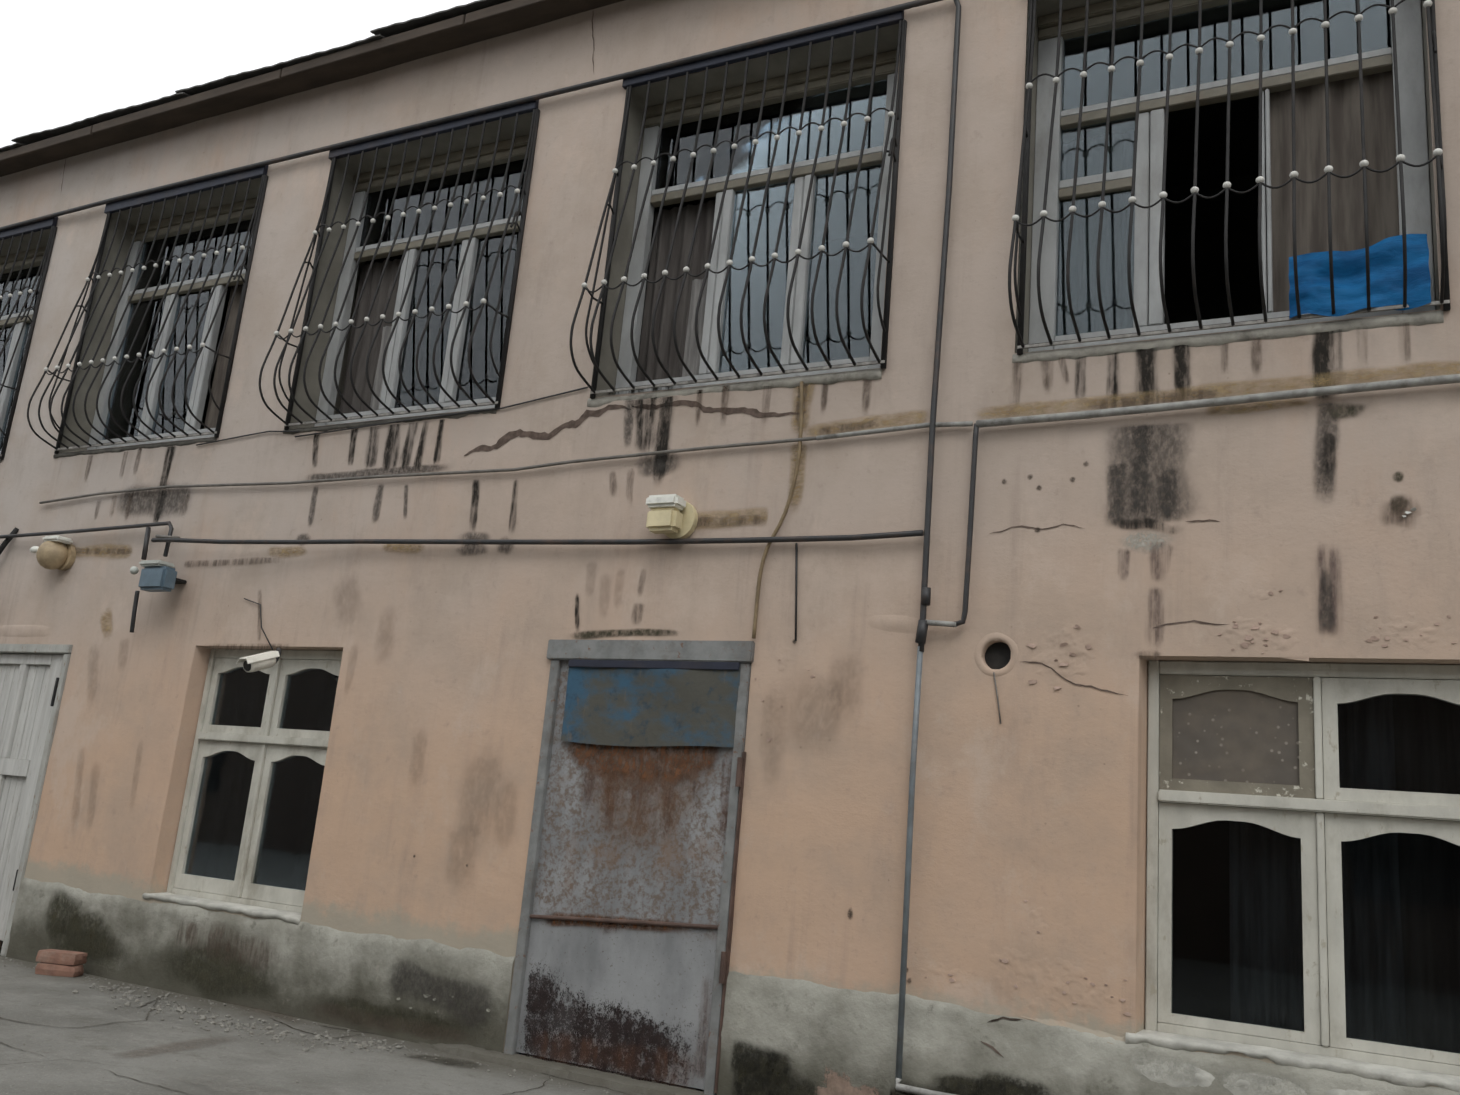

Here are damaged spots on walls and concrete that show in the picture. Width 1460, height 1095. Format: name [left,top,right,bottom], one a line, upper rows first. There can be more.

leakage [1105,348,1154,408]
leakage [1171,345,1203,402]
leakage [1312,330,1363,492]
leakage [1109,425,1182,572]
peeling [1022,621,1097,690]
rust [570,742,716,815]
rust [548,913,675,931]
crack [0,997,192,1095]
crack [271,1018,374,1038]
rust [521,963,705,1086]
crack [503,1070,630,1095]
flaking render [815,1067,879,1095]